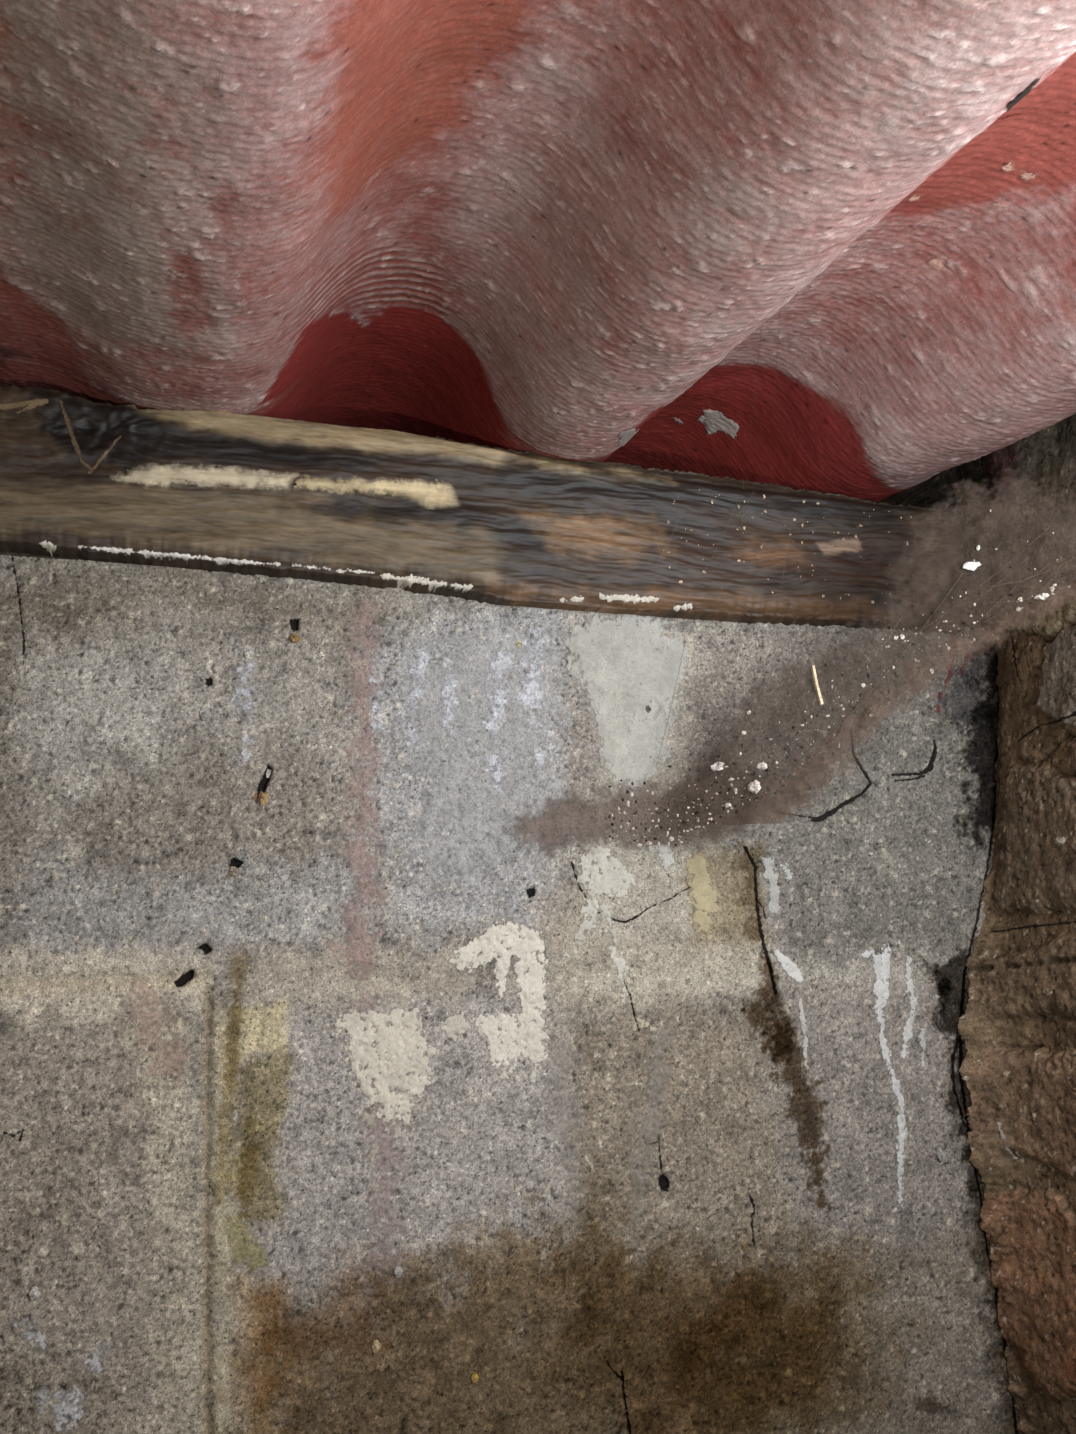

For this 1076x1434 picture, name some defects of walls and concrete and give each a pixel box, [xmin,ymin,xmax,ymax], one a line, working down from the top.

water stain [120,465,455,507]
water stain [673,409,739,439]
crack [792,739,937,822]
water stain [956,628,999,849]
crack [743,846,778,994]
crack [968,781,1076,956]
peeling [331,842,636,1193]
peeling [636,1017,659,1032]
water stain [749,949,829,1207]
water stain [859,944,980,1205]
crack [951,1033,968,1123]
crack [604,1356,631,1434]